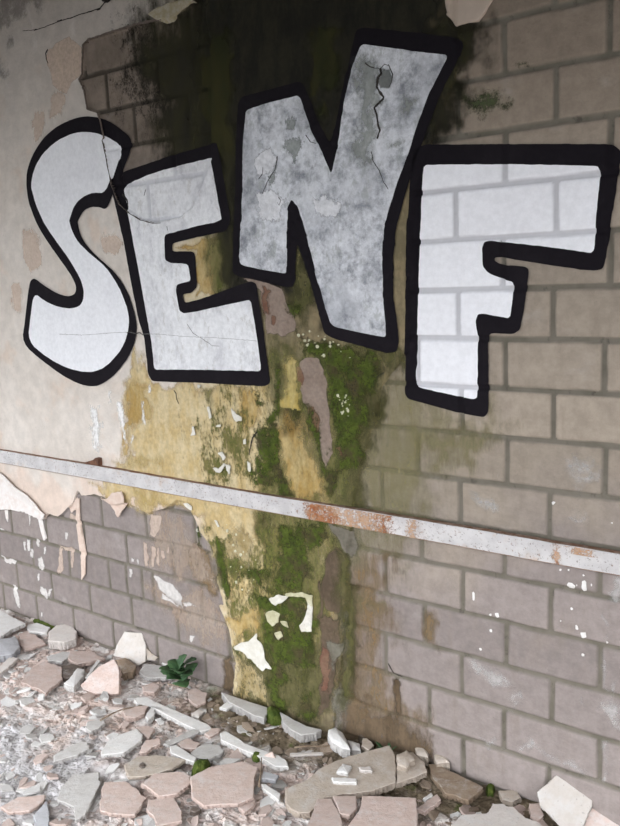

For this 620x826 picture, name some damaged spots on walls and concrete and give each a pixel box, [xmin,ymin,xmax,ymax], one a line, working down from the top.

spalling [45,5,195,223]
crack [102,141,168,231]
water stain [110,0,476,296]
crack [365,63,393,189]
water stain [108,348,323,500]
peeling [296,357,342,466]
water stain [348,344,406,507]
spalling [0,473,272,826]
water stain [98,482,433,759]
peeling [265,548,343,716]
rust [303,502,393,534]
rust [552,546,592,564]